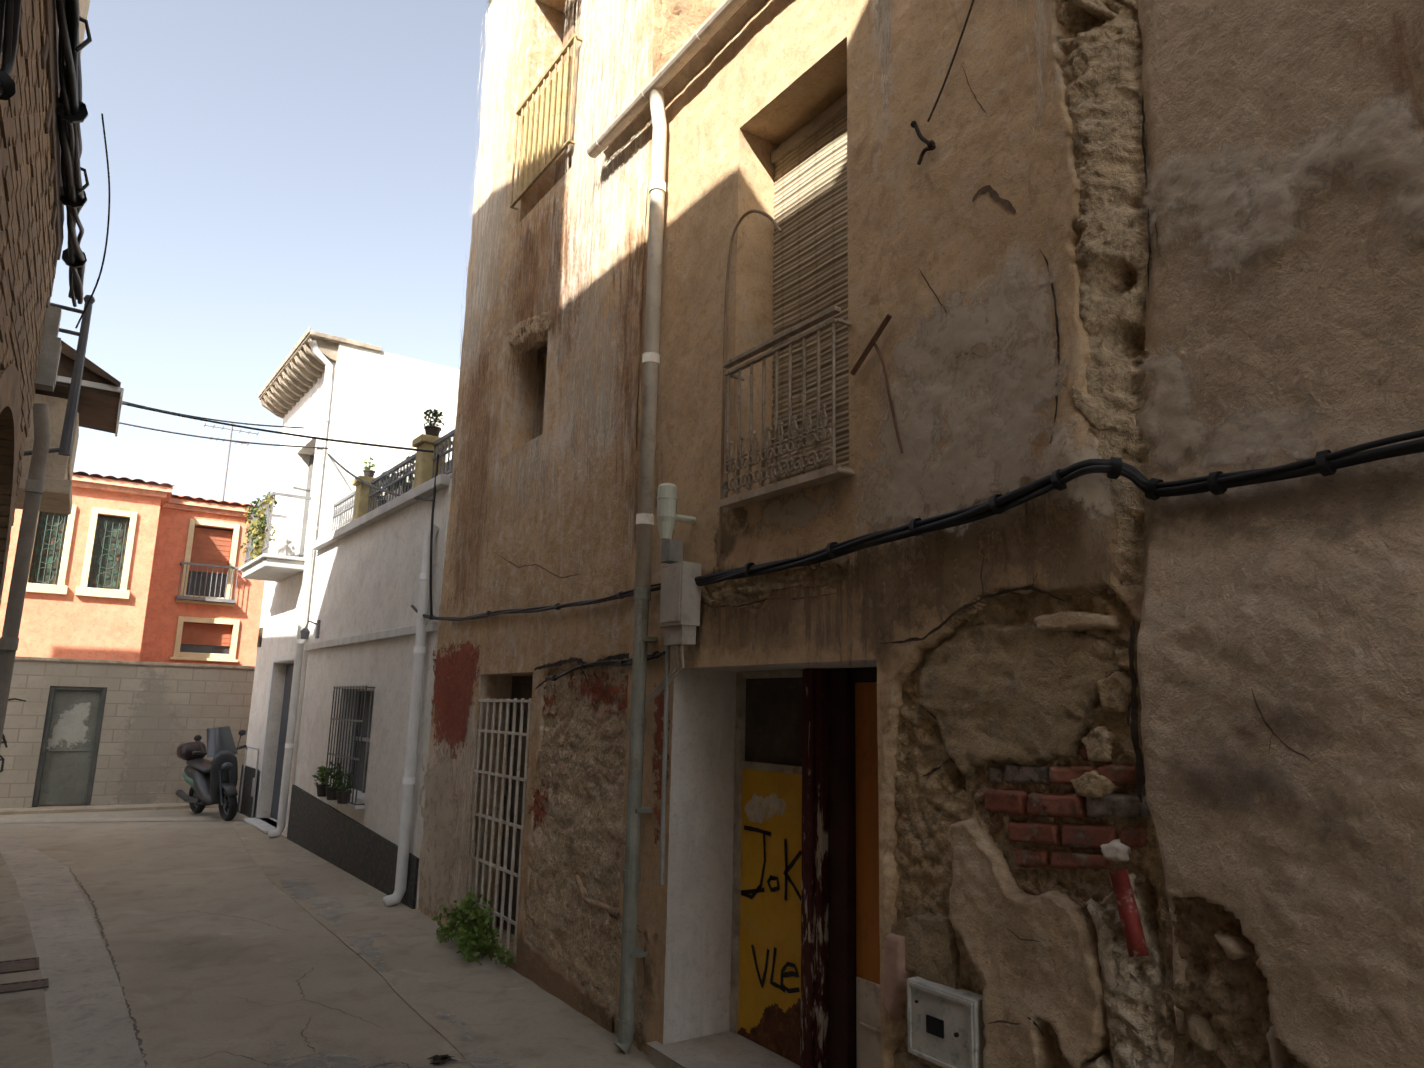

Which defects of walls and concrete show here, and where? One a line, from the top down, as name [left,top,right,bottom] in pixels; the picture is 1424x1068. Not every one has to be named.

leakage [448,0,653,608]
flaking render [881,0,1324,1068]
flaking render [528,658,629,915]
crack [70,868,148,1067]
crack [184,967,410,1068]